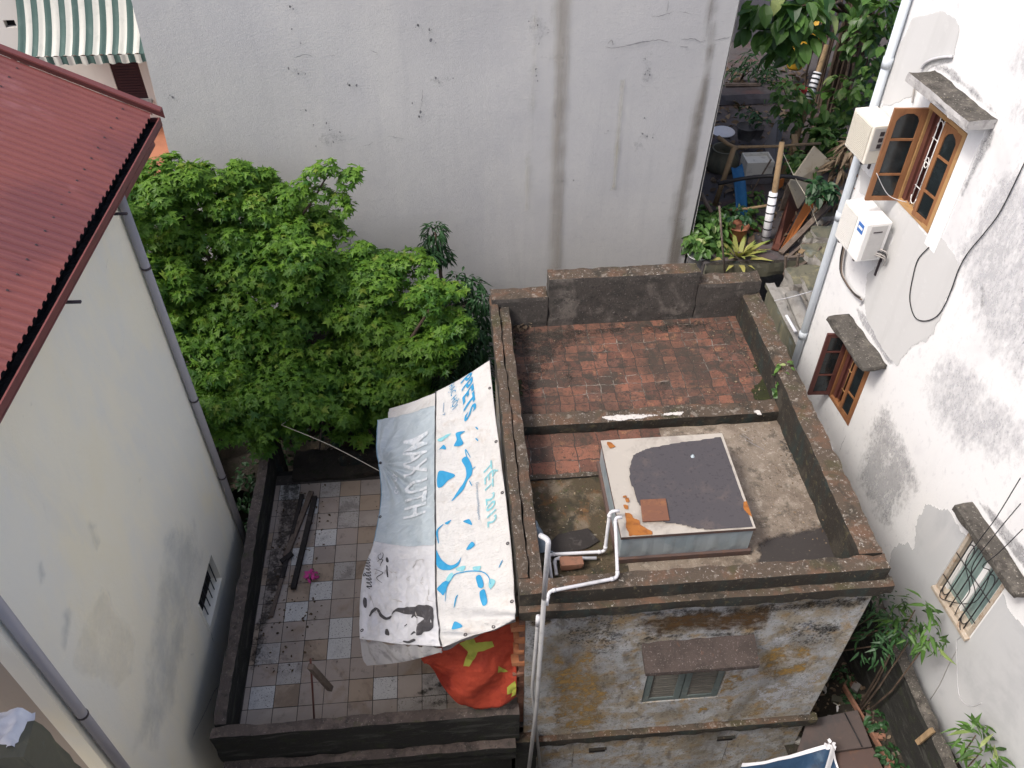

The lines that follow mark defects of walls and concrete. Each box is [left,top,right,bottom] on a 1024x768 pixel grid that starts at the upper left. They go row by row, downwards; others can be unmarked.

crack [608,1,729,48]
peeling [882,11,959,106]
damp [670,86,706,264]
peeling [859,167,960,366]
damp [862,418,913,521]
damp [757,527,835,562]
damp [754,597,867,612]
damp [783,621,838,645]
peeling [879,505,1024,768]